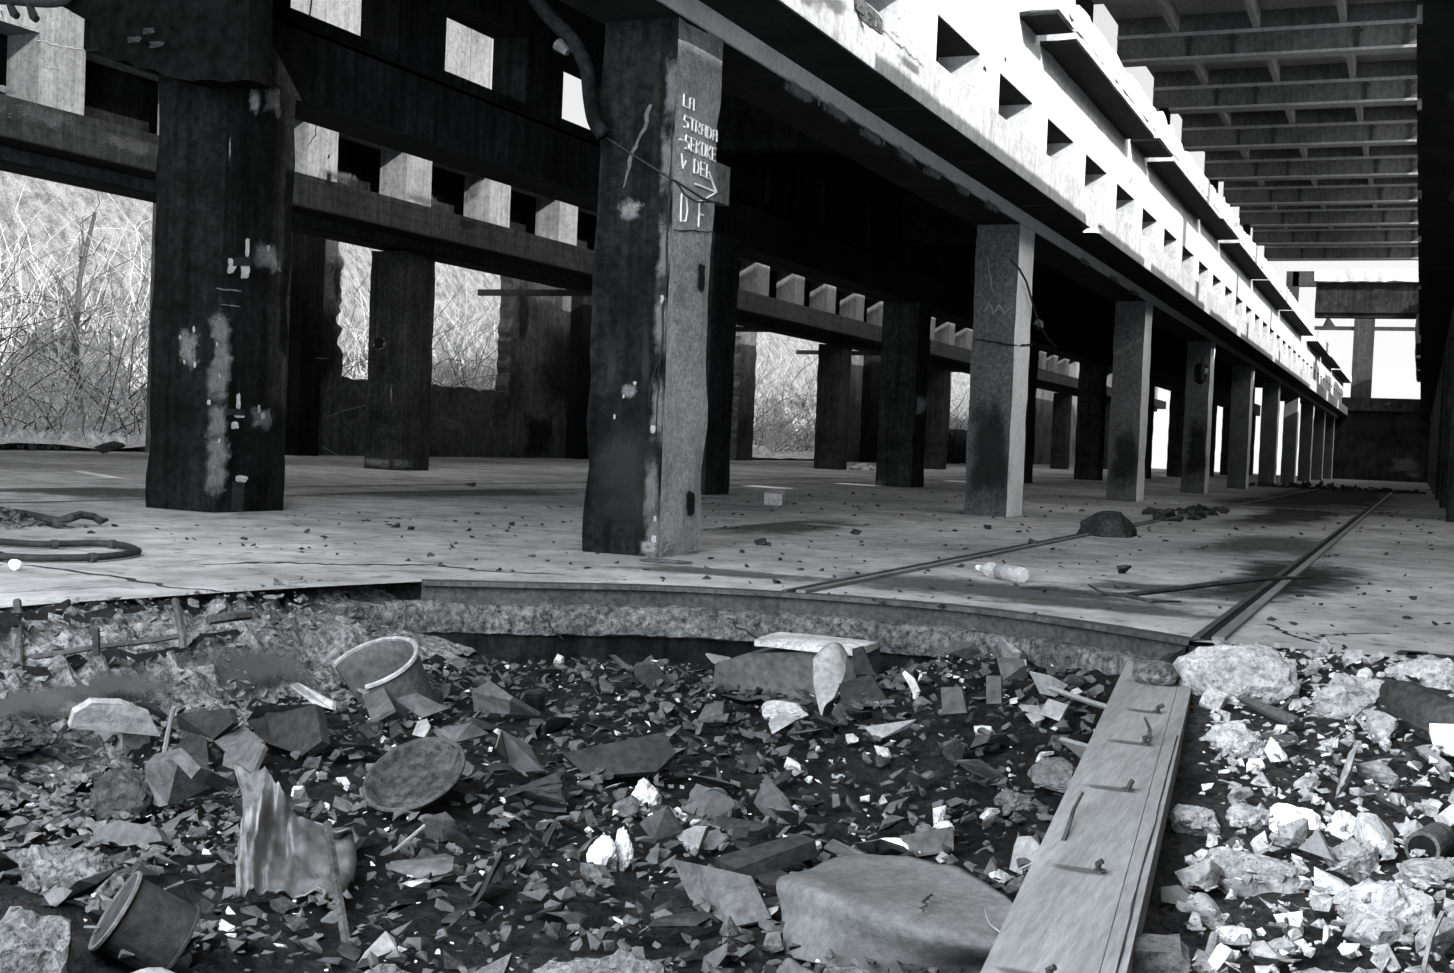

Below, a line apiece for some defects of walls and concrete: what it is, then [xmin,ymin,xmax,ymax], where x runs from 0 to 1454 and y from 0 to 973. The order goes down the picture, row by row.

spalling [179,315,231,493]